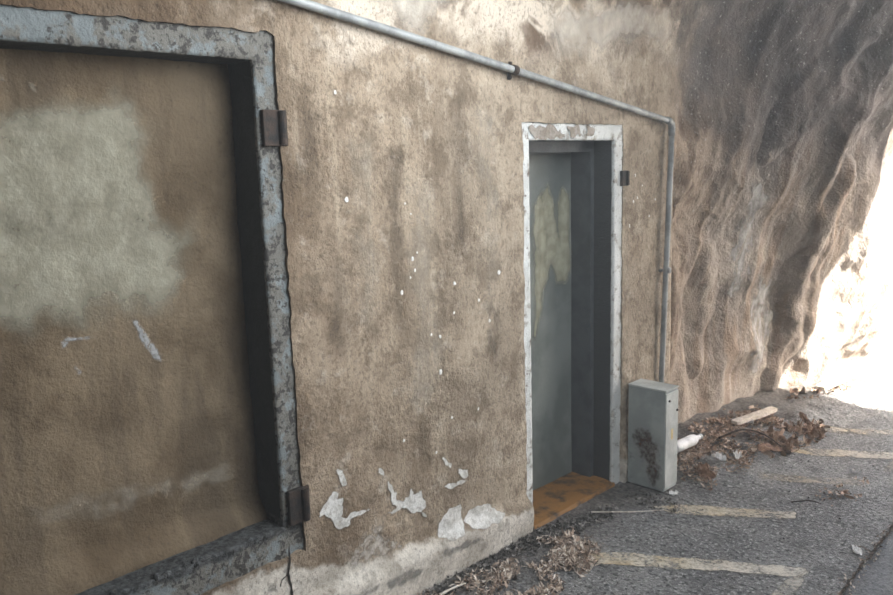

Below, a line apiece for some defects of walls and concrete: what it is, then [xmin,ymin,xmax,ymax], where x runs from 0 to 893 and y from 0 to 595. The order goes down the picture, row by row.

peeling [319,469,370,530]
peeling [378,468,427,517]
peeling [442,457,468,489]
peeling [438,503,507,541]
crack [280,546,293,595]